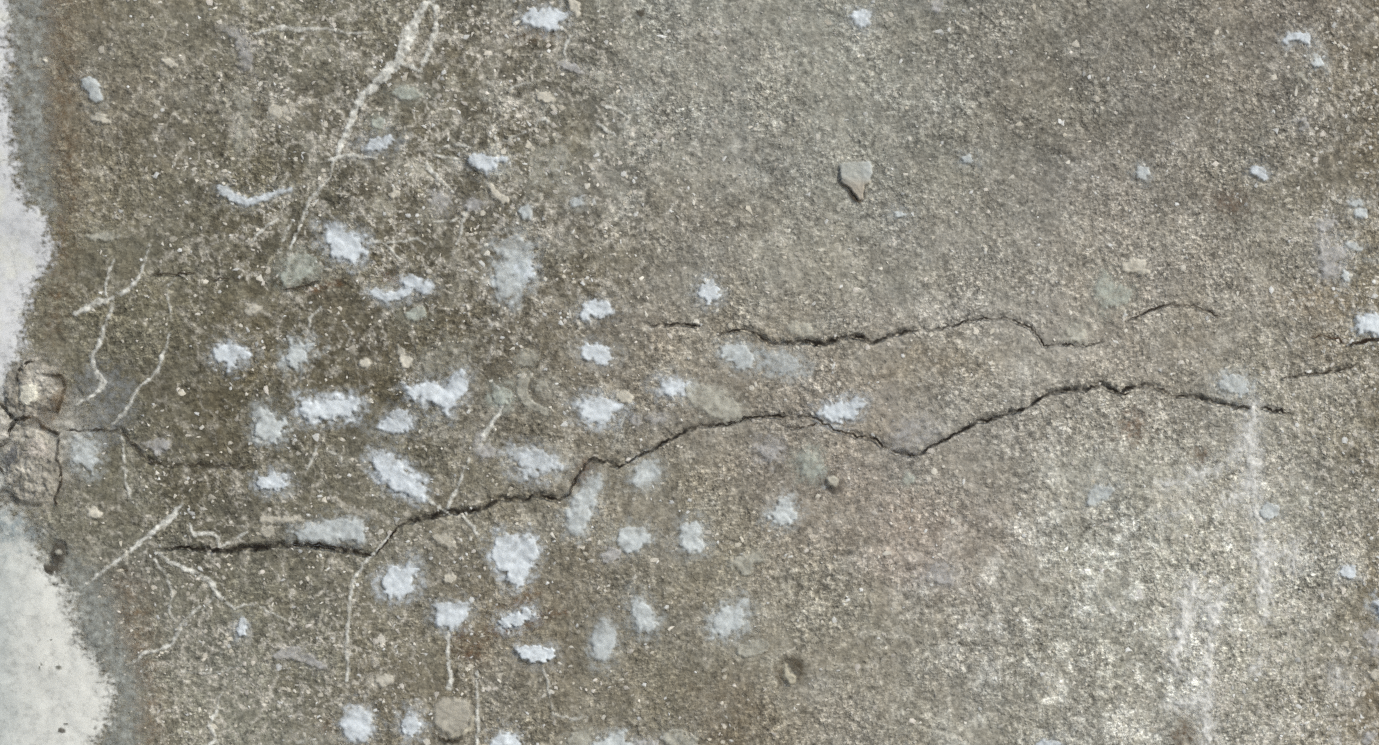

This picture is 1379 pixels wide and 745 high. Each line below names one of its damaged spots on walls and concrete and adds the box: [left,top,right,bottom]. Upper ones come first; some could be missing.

crack [651,316,1102,347]
crack [1132,303,1220,318]
crack [0,359,251,506]
crack [166,334,1379,556]